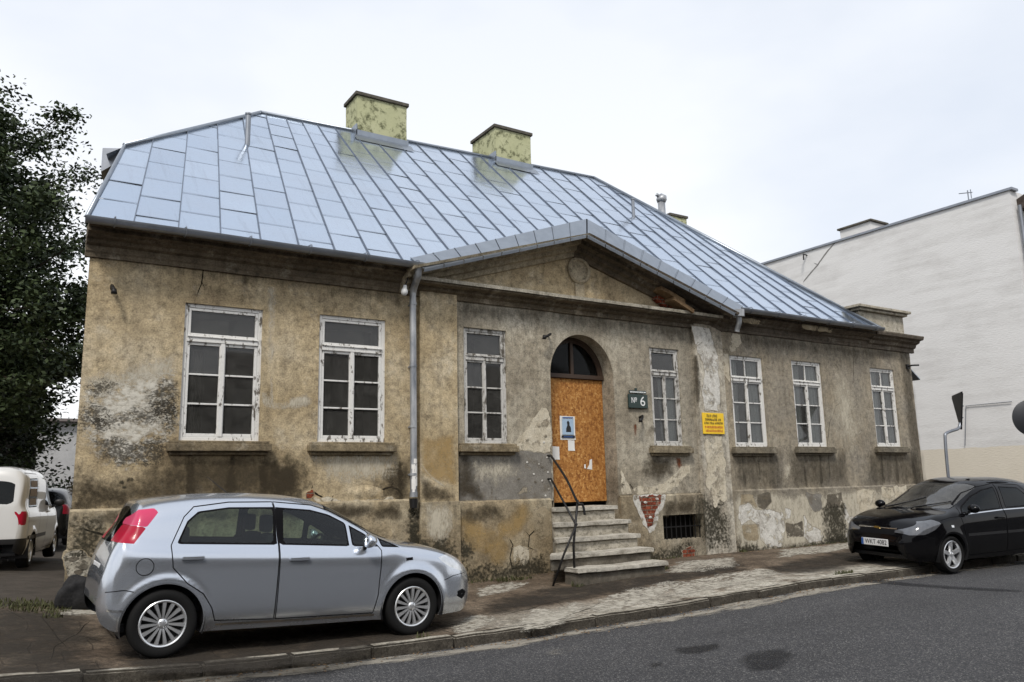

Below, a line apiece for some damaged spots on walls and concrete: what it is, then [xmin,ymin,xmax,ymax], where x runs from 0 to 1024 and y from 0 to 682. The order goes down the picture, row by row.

flaking render [691,325,742,412]
flaking render [515,406,553,497]
flaking render [619,465,691,534]
flaking render [704,435,727,508]
water stain [793,503,848,547]
flaking render [738,484,907,548]